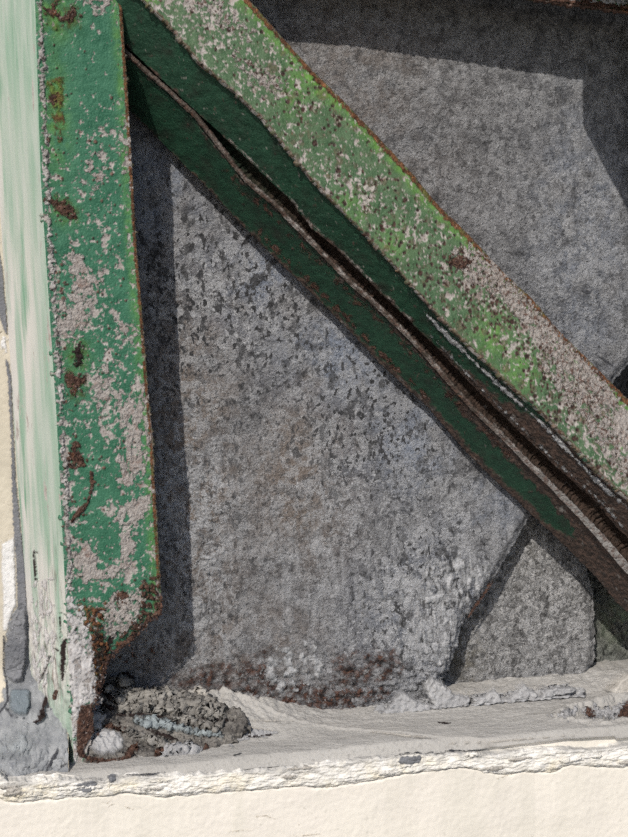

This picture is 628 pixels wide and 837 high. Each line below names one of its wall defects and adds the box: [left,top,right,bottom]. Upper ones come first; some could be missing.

corrosion [43,195,77,220]
peeling [37,0,110,378]
corrosion [244,0,628,405]
corrosion [64,344,86,396]
corrosion [64,435,96,523]
peeling [91,358,151,488]
corrosion [76,4,167,763]
peeling [114,317,143,343]
peeling [451,241,628,485]
spalling [0,384,628,803]
corrosion [332,650,405,686]
corrosion [617,701,628,717]